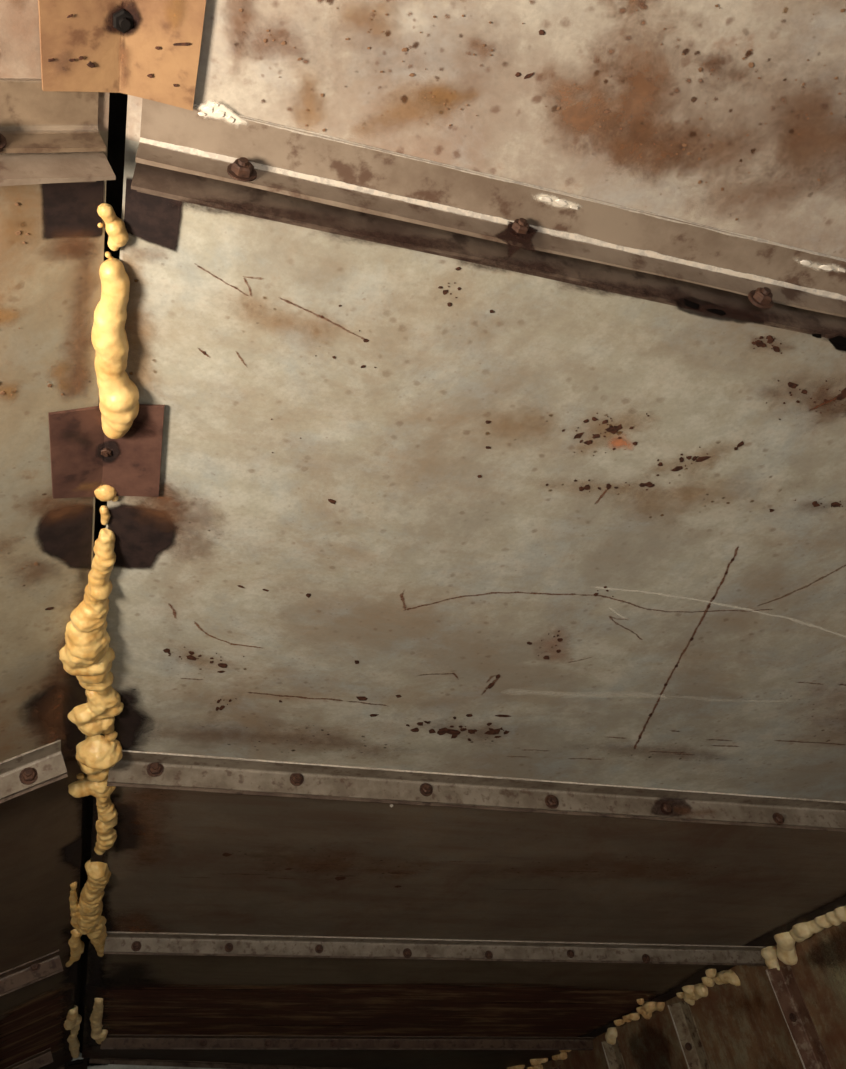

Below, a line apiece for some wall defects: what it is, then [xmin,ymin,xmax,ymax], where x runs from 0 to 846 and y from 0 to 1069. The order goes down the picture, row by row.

rust [545,37,719,169]
rust [175,199,795,354]
rust [562,413,638,456]
rust [778,380,846,414]
rust [39,664,85,754]
rust [406,714,511,743]